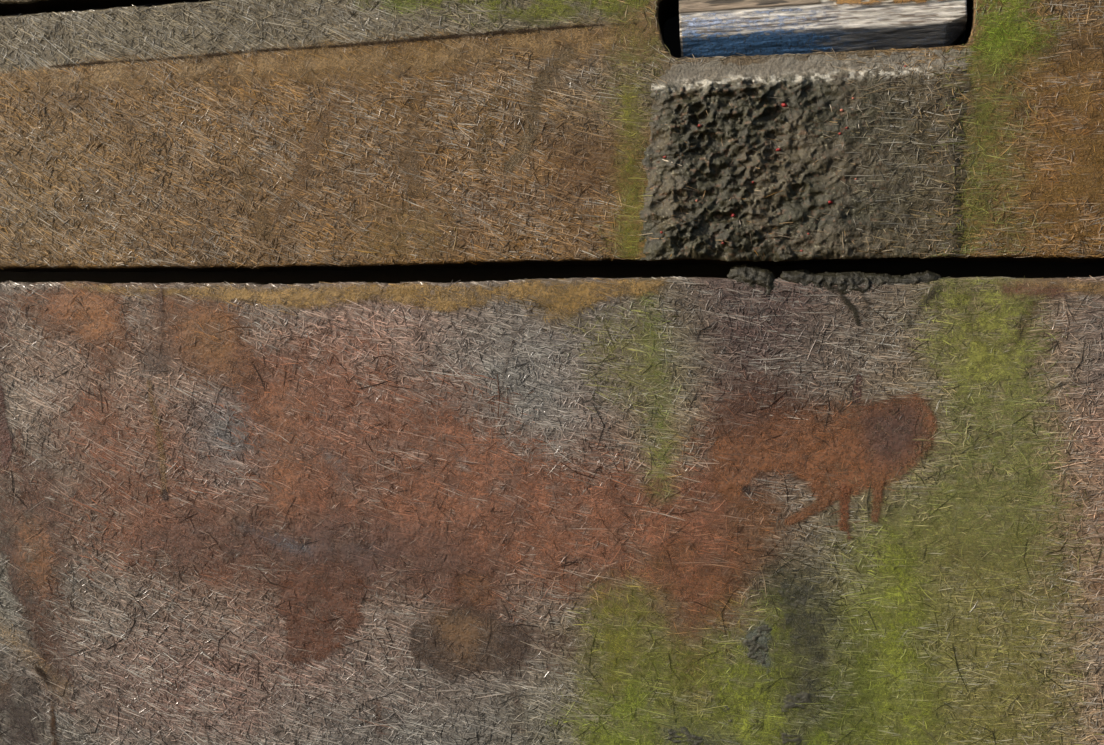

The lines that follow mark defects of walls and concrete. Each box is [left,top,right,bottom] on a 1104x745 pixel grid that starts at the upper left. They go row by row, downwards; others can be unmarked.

spalling [636,8,973,262]
corrosion [20,285,128,358]
corrosion [712,375,937,568]
corrosion [411,607,529,675]